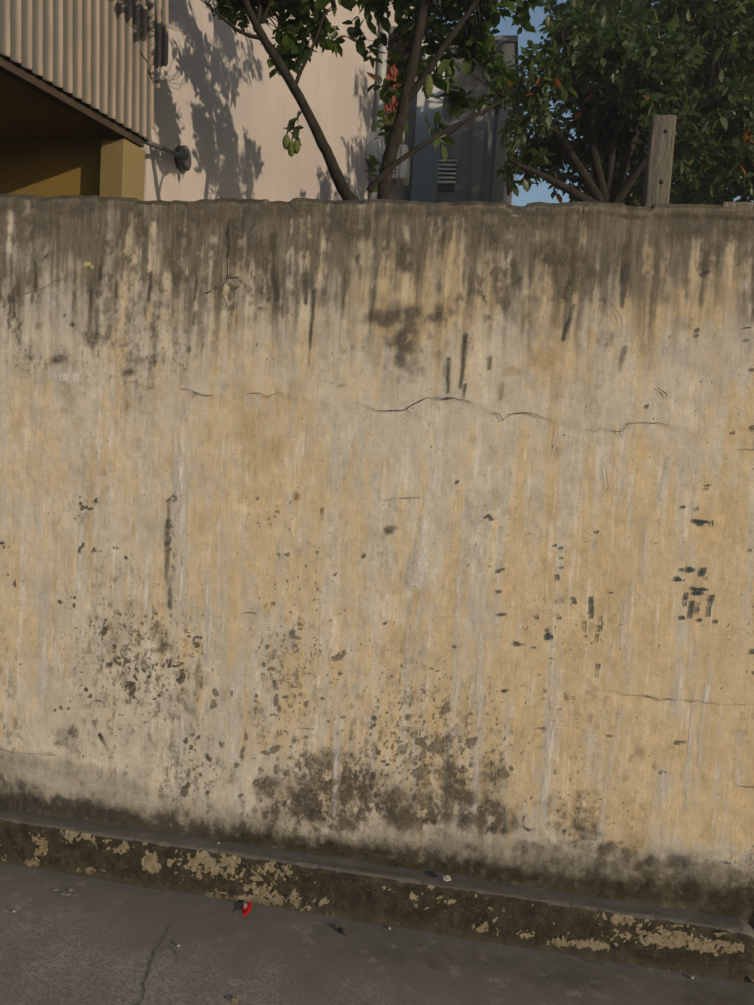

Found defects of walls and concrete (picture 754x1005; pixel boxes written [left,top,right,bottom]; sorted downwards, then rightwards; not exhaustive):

leakage [303,275,316,349]
leakage [371,306,443,367]
leakage [447,334,468,396]
crack [358,396,471,414]
crack [493,411,558,455]
leakage [166,455,186,612]
leakage [177,715,190,797]
leakage [227,682,531,844]
spalling [145,855,174,869]
spalling [214,864,291,901]
crack [138,923,178,1005]
spalling [556,917,733,953]